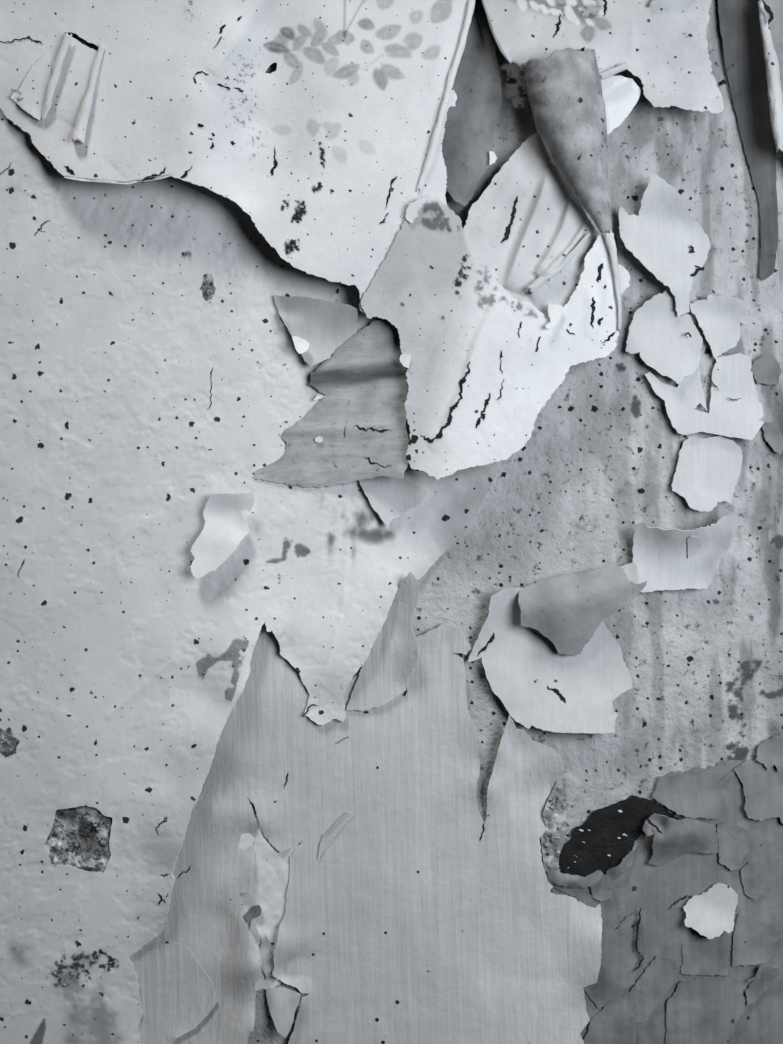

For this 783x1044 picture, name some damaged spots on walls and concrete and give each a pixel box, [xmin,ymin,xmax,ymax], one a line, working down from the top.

peeling [0,108,680,1044]
peeling [618,174,783,593]
peeling [642,736,783,871]
peeling [665,883,783,1044]